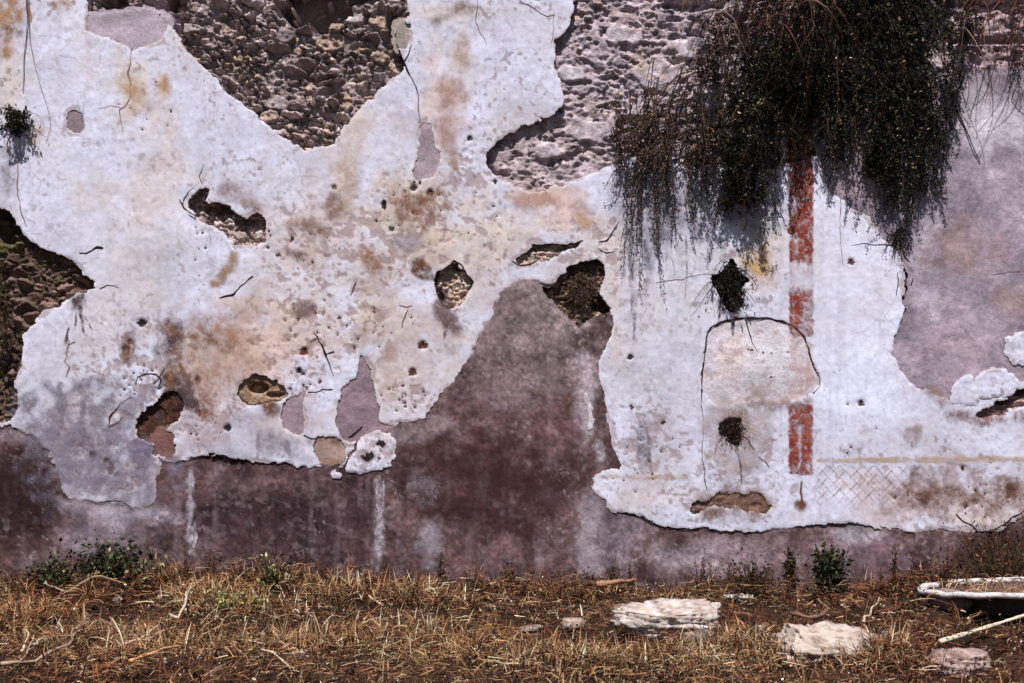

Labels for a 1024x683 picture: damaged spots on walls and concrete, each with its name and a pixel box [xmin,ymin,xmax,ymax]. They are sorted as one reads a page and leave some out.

spalling [86,0,411,151]
spalling [190,189,281,256]
flaking render [486,0,1024,420]
damp [0,319,200,556]
damp [375,475,385,557]
flaking render [0,208,1024,594]
crack [701,317,820,491]